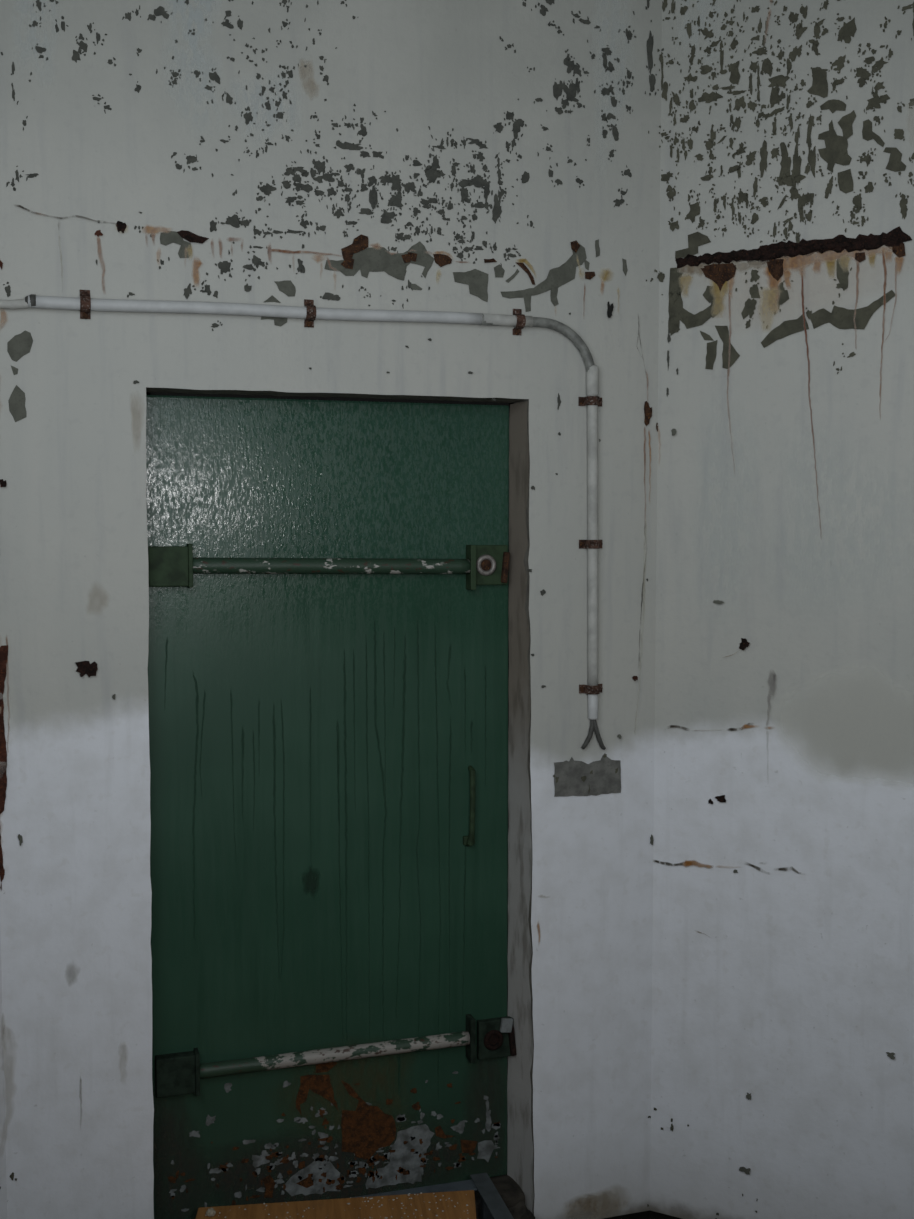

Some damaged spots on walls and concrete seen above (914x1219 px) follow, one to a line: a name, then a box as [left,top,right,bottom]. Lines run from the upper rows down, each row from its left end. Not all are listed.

peeling [29,0,116,66]
peeling [122,0,189,23]
spalling [156,0,914,375]
peeling [134,212,192,269]
rust [145,226,243,284]
rust [268,234,417,270]
rust [433,251,468,276]
rust [680,243,905,530]
water stain [767,673,776,722]
water stain [787,672,914,778]
rust [216,1062,478,1205]
peeling [234,1095,501,1198]